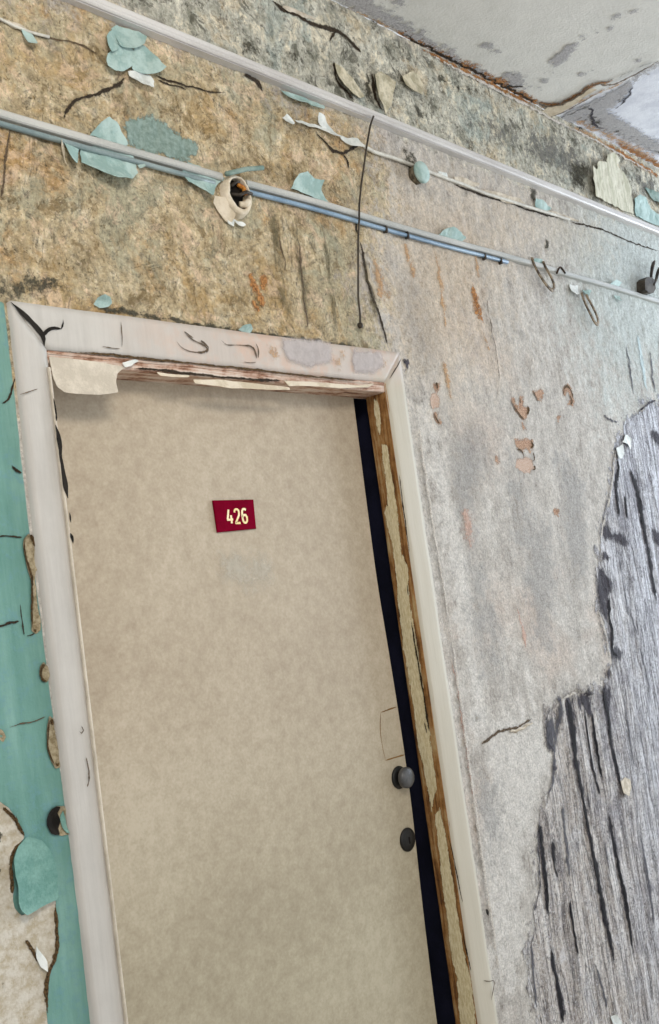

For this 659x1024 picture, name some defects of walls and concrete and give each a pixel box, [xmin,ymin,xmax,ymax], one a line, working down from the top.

crack [64,78,124,117]
peeling [106,25,167,87]
crack [156,75,223,93]
crack [273,1,382,109]
corrosion [356,12,622,109]
crack [402,35,656,129]
leakage [469,107,587,189]
corrosion [575,120,659,177]
corrosion [248,273,268,312]
peeling [49,339,386,395]
flaking render [521,393,659,1024]
flaking render [0,802,70,1024]